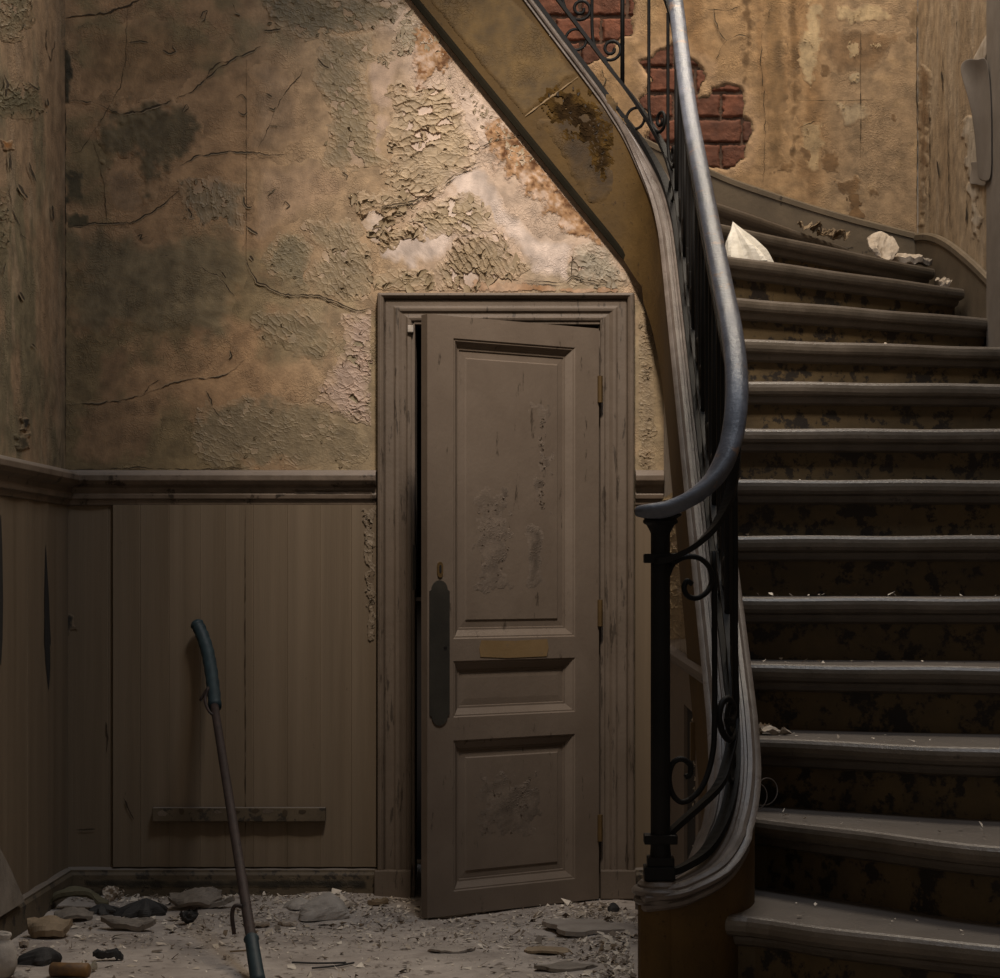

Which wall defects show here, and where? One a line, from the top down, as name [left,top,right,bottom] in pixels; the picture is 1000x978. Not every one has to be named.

crack [3,0,372,470]
peeling [189,0,634,470]
water stain [538,85,615,182]
flaking render [640,46,674,150]
flaking render [691,61,752,169]
water stain [736,0,879,218]
water stain [820,27,907,77]
peeling [961,115,984,255]
peeling [362,506,376,641]